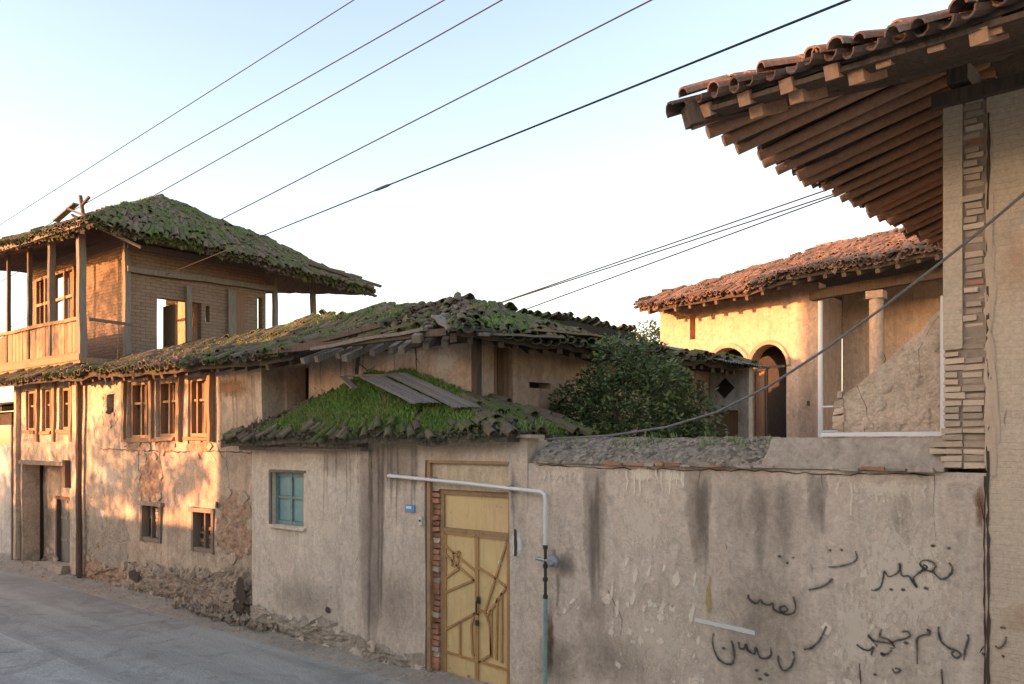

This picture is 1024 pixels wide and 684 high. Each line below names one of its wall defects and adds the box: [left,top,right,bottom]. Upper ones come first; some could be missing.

spalling [82,487,425,670]
spalling [601,557,705,684]